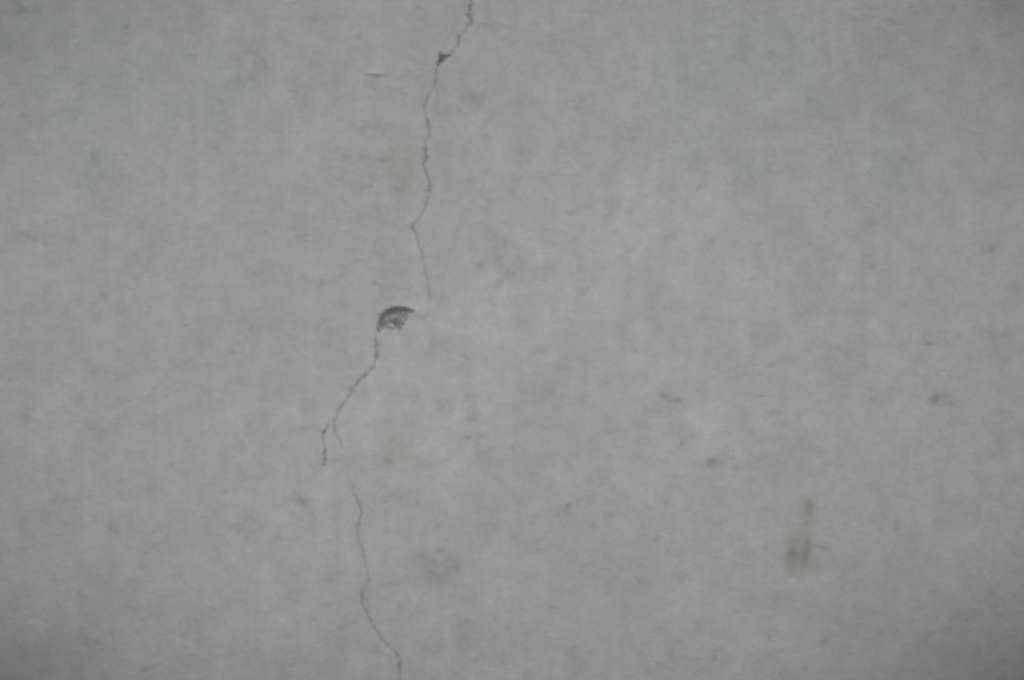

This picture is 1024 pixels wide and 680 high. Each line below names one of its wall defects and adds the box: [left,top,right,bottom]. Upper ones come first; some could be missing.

flaking render [377,307,414,331]